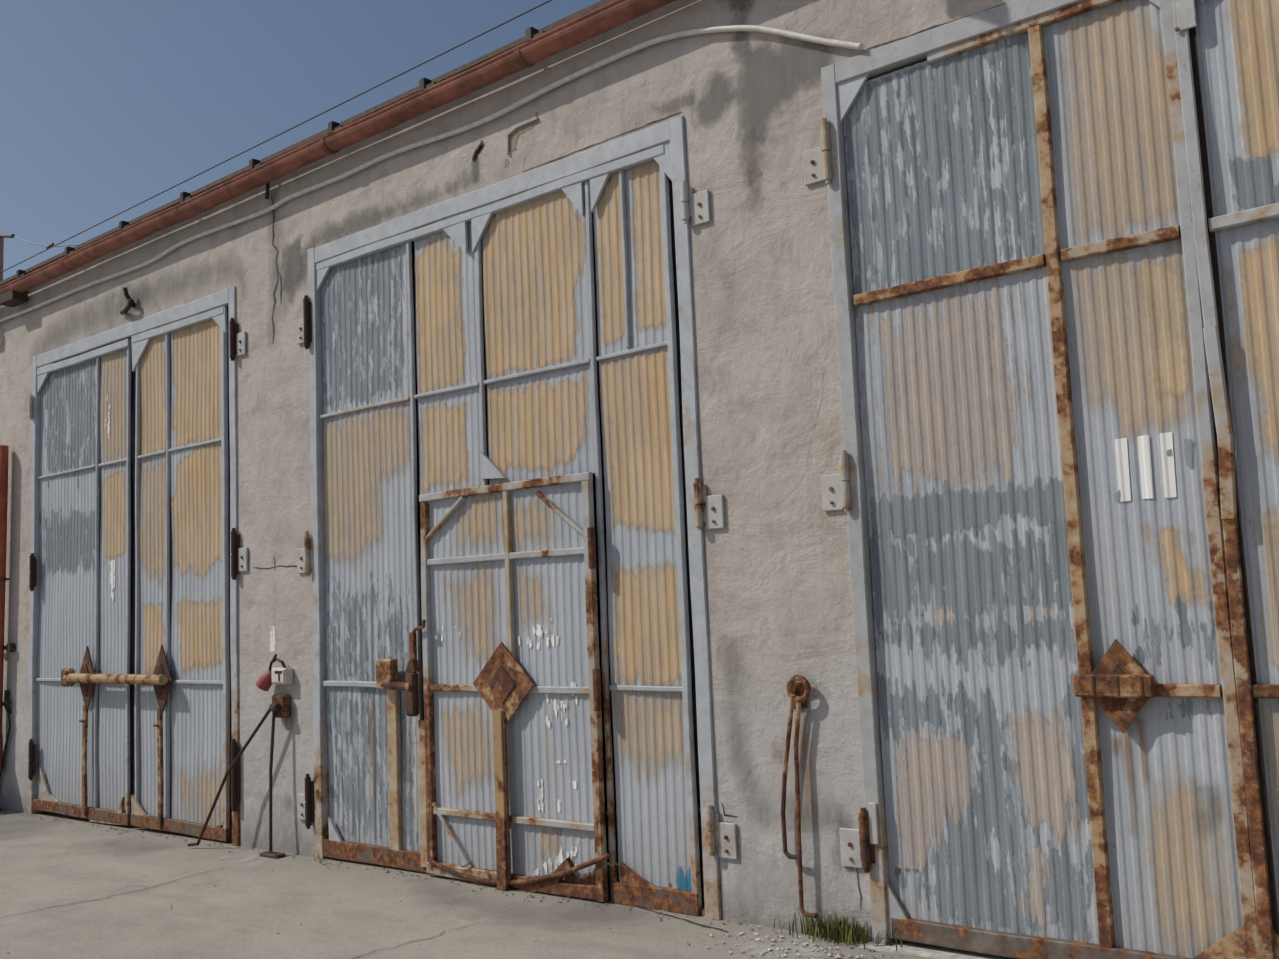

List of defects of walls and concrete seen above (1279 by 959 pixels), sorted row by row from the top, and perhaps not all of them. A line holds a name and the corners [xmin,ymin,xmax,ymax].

leakage [667,0,830,183]
peeling [39,319,222,582]
crack [271,196,282,339]
peeling [320,236,469,559]
peeling [483,160,667,474]
peeling [603,347,676,533]
peeling [844,32,1094,942]
peeling [143,603,164,674]
peeling [179,595,223,674]
peeling [443,705,490,794]
peeling [534,828,577,880]
corrosion [561,868,596,885]